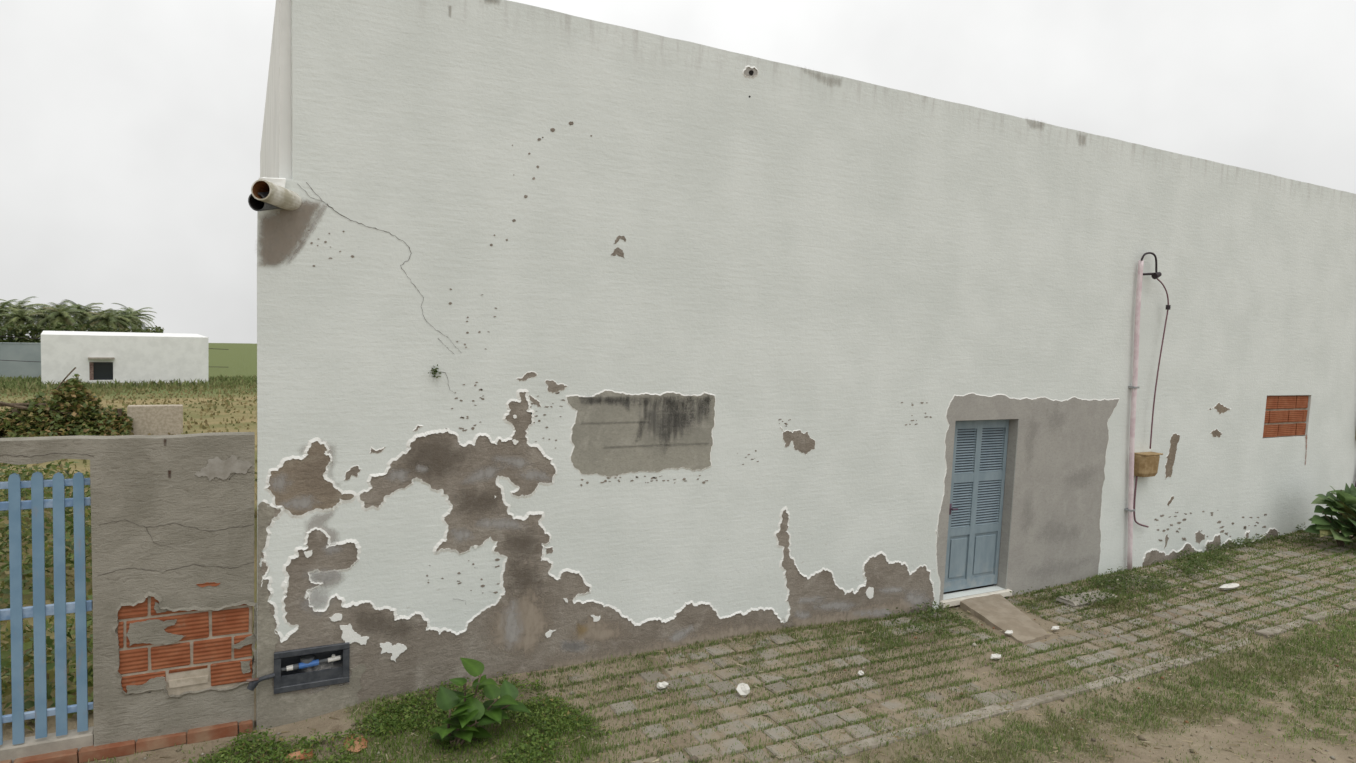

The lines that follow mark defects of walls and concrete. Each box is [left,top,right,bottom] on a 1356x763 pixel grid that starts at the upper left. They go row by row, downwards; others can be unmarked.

damp [260,201,319,265]
spalling [611,236,626,258]
crack [299,182,455,389]
peeling [1164,433,1180,480]
peeling [110,371,935,704]
peeling [1142,496,1279,567]